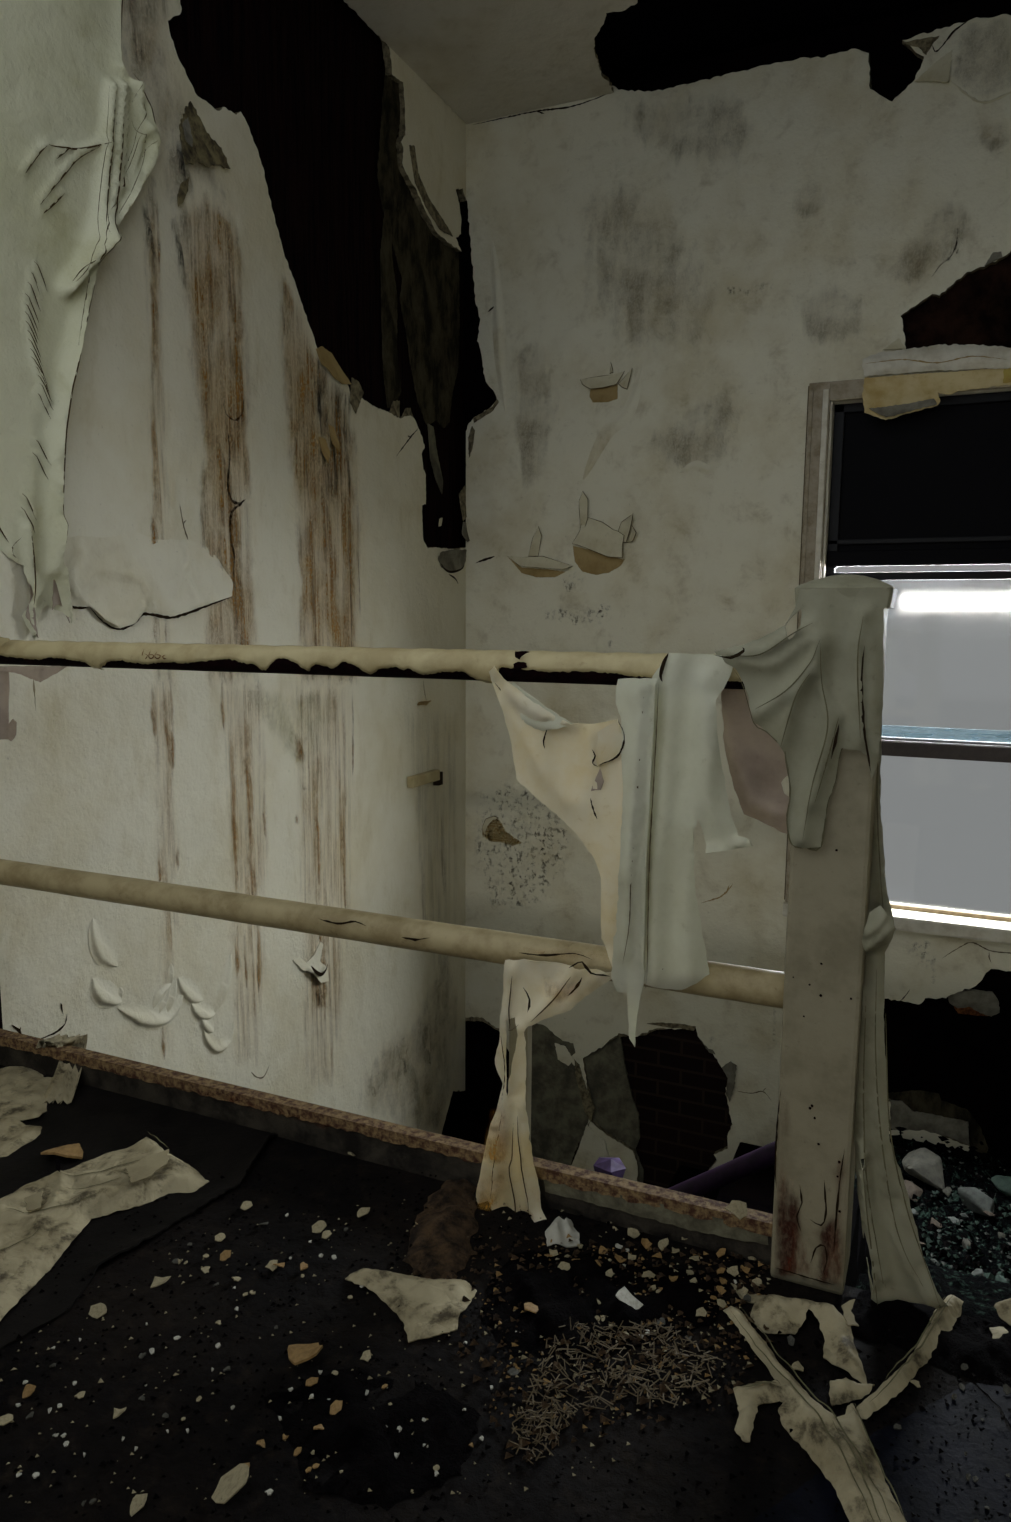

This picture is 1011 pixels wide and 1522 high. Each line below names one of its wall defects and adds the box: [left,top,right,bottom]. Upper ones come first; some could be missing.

flaking render [609,0,1011,104]
peeling [0,0,161,639]
flaking render [168,0,499,549]
flaking render [883,252,1011,350]
damp [144,204,251,645]
peeling [862,368,1011,420]
damp [286,347,355,647]
peeling [508,491,637,577]
corrosion [0,1029,486,1163]
peeling [441,589,1011,1522]
corrosion [533,1157,798,1274]